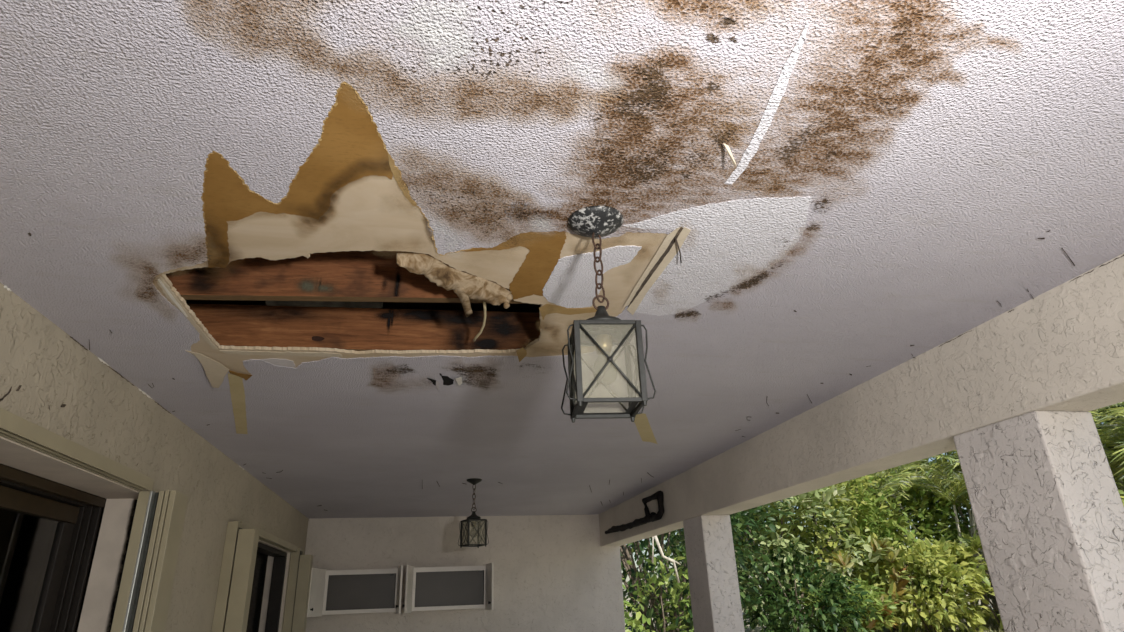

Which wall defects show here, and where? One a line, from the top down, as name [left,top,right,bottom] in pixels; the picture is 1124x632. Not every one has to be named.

leakage [194,0,1006,249]
mould [130,261,158,302]
leakage [167,243,238,292]
peeling [201,81,642,320]
leakage [674,195,831,320]
leakage [371,309,524,389]